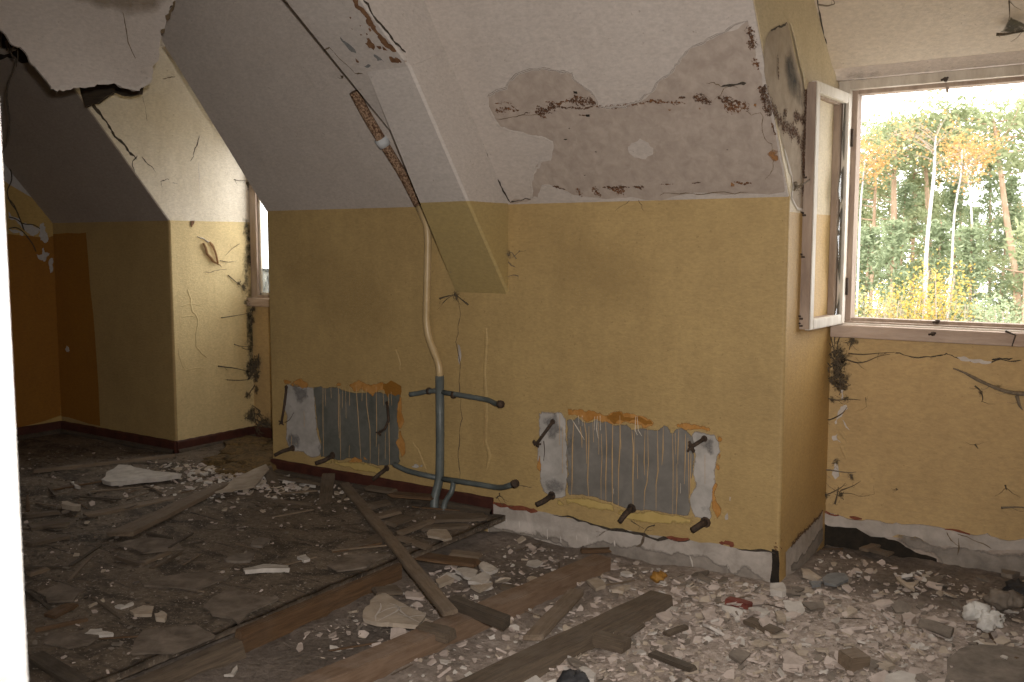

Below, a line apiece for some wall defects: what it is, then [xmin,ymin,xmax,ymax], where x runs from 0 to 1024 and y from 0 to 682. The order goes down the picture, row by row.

spalling [0,31,28,63]
spalling [53,77,153,91]
crack [92,104,173,186]
peeling [340,0,401,68]
peeling [486,20,811,212]
peeling [5,211,100,428]
crack [896,330,1021,364]
flaking render [488,390,1024,583]